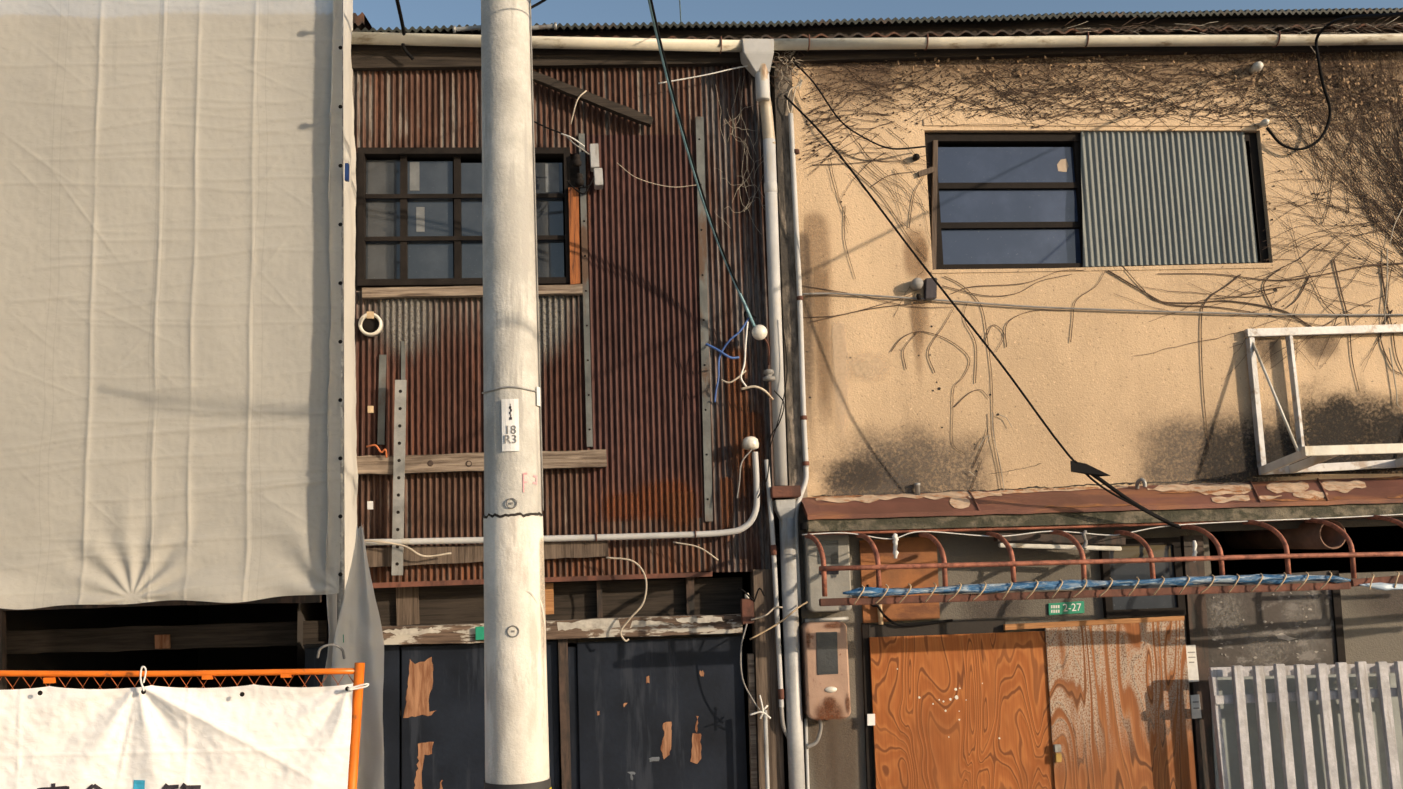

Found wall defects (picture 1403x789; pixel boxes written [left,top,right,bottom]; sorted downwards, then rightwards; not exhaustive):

damp [383,298,427,346]
damp [536,295,564,351]
damp [1259,338,1275,359]
damp [1146,394,1403,485]
damp [830,433,985,496]
peeling [816,486,1128,509]
peeling [1147,480,1366,503]
peeling [403,657,435,718]
peeling [414,742,434,789]
peeling [649,722,672,762]
peeling [690,716,701,764]